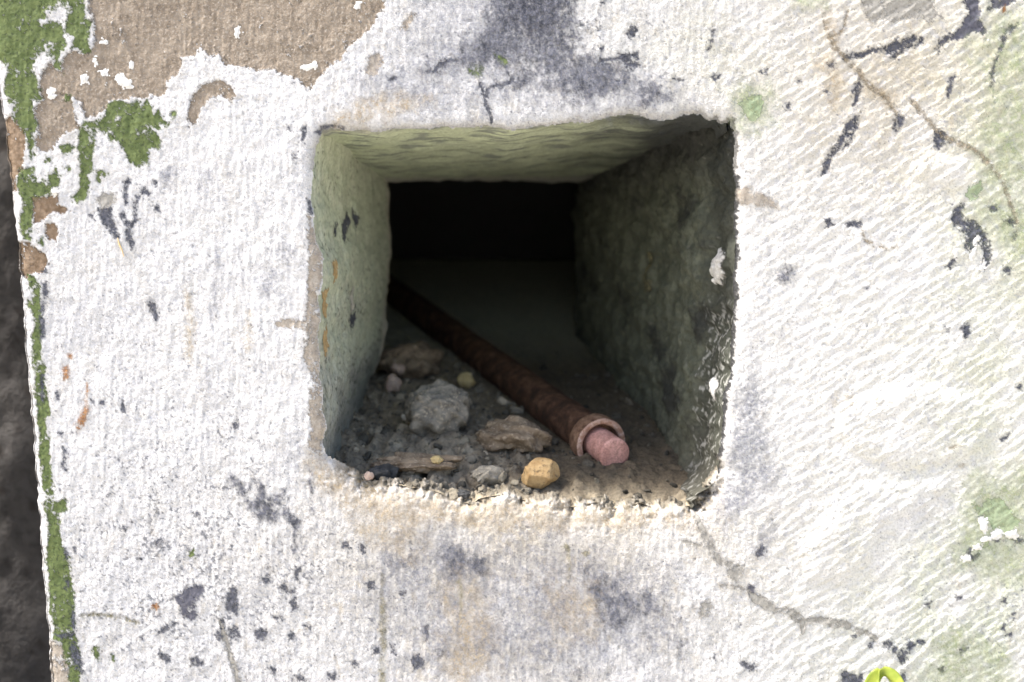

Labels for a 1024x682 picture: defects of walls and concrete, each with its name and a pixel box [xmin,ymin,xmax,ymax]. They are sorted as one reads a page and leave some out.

damp [418,0,668,106]
spalling [0,0,385,682]
crack [683,508,878,641]
peeling [410,654,425,669]